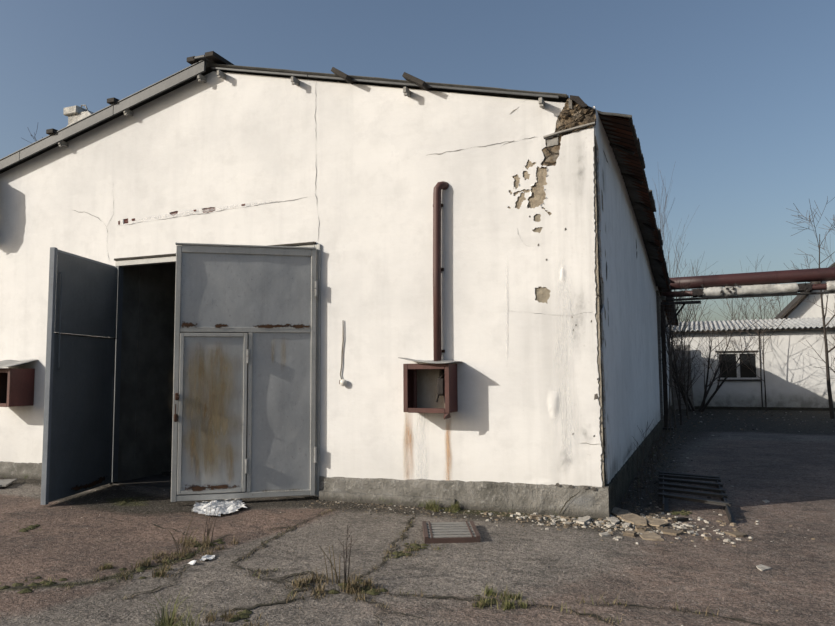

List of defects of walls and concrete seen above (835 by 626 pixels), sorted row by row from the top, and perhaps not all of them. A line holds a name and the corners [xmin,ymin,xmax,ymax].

crack [428,137,534,155]
flaking render [508,98,596,233]
flaking render [118,196,313,225]
flaking render [535,287,551,303]
spalling [555,140,609,491]